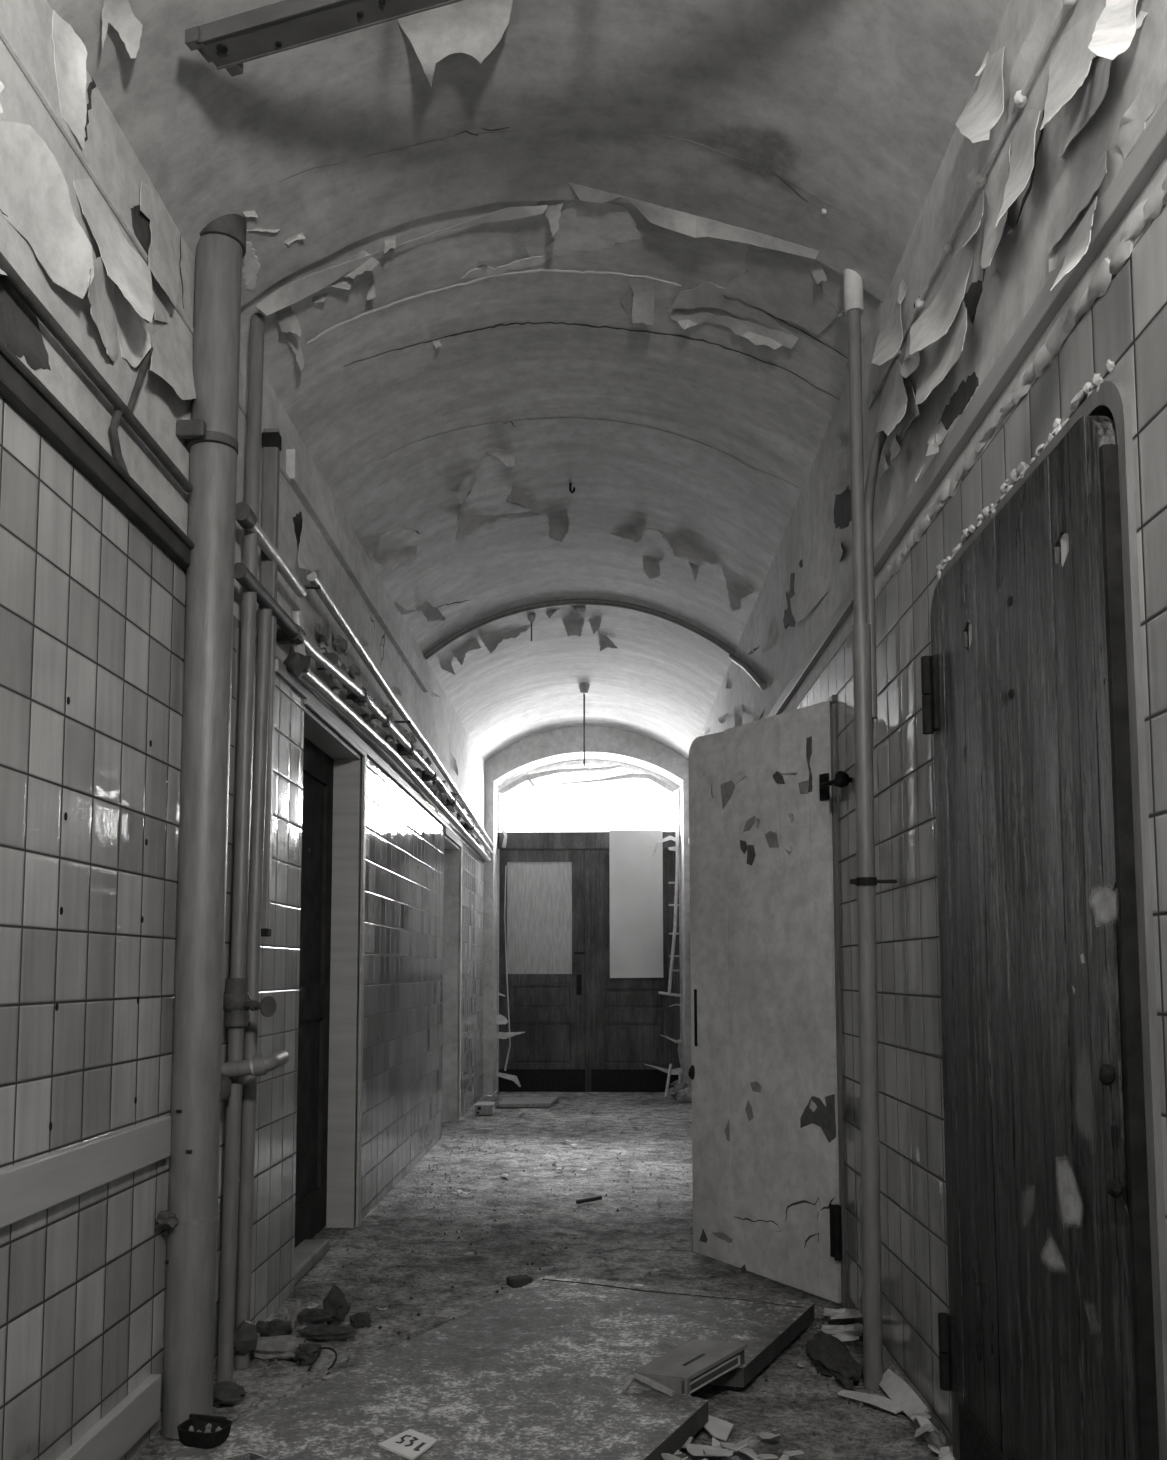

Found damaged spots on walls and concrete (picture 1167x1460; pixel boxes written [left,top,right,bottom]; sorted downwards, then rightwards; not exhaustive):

peeling [52,0,143,149]
peeling [0,255,51,370]
peeling [73,179,196,400]
peeling [242,182,846,371]
flaking render [872,0,1167,583]
peeling [293,512,323,571]
peeling [395,600,469,622]
peeling [437,625,531,675]
peeling [455,448,570,542]
peeling [546,605,617,651]
peeling [611,526,756,611]
flaking render [830,483,852,559]